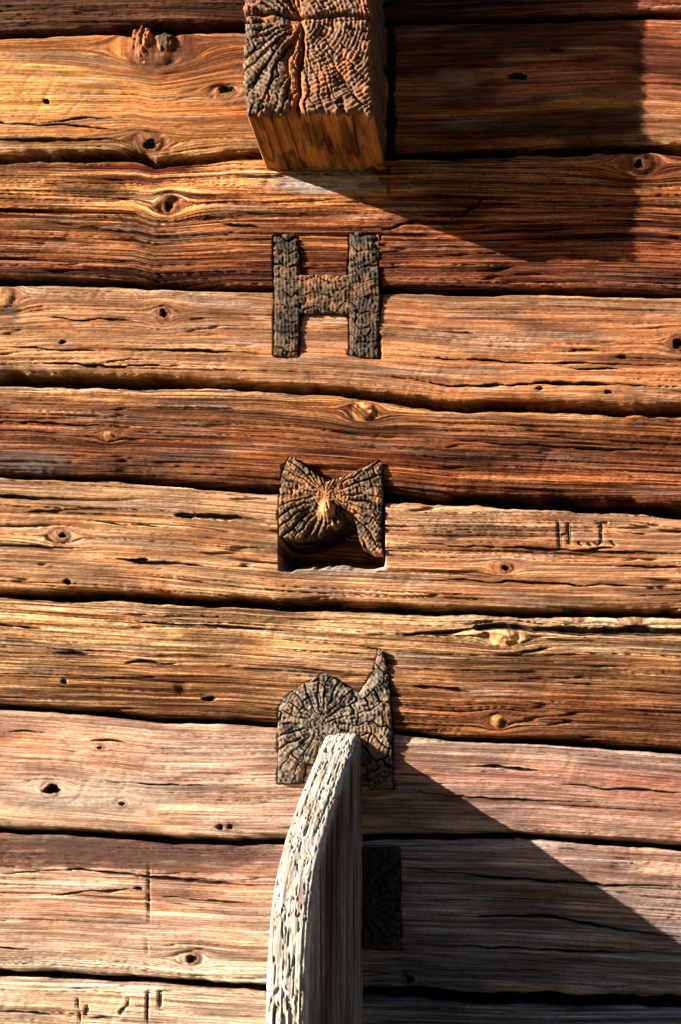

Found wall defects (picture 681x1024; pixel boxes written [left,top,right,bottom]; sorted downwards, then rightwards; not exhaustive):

crack [0,117,133,145]
crack [91,513,275,527]
crack [400,765,680,802]